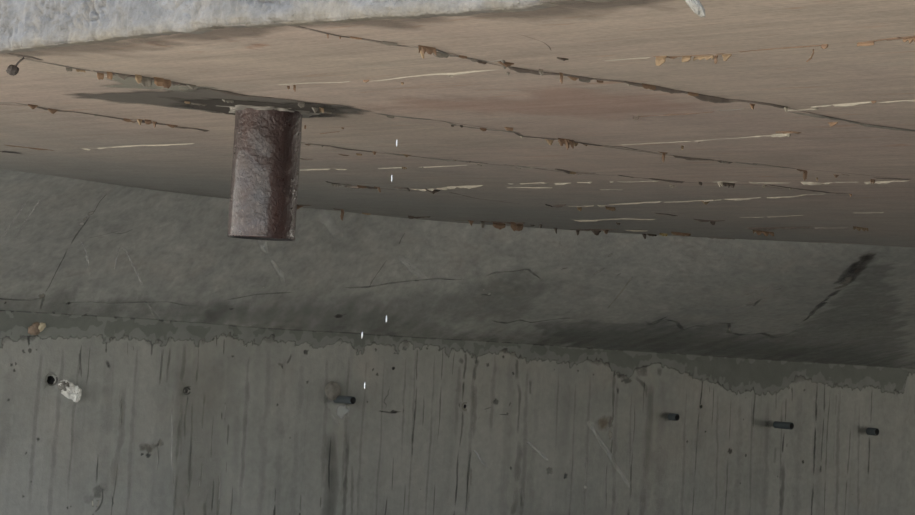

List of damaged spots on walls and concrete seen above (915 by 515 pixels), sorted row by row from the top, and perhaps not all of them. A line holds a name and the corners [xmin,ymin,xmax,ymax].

crack [804,255,874,321]